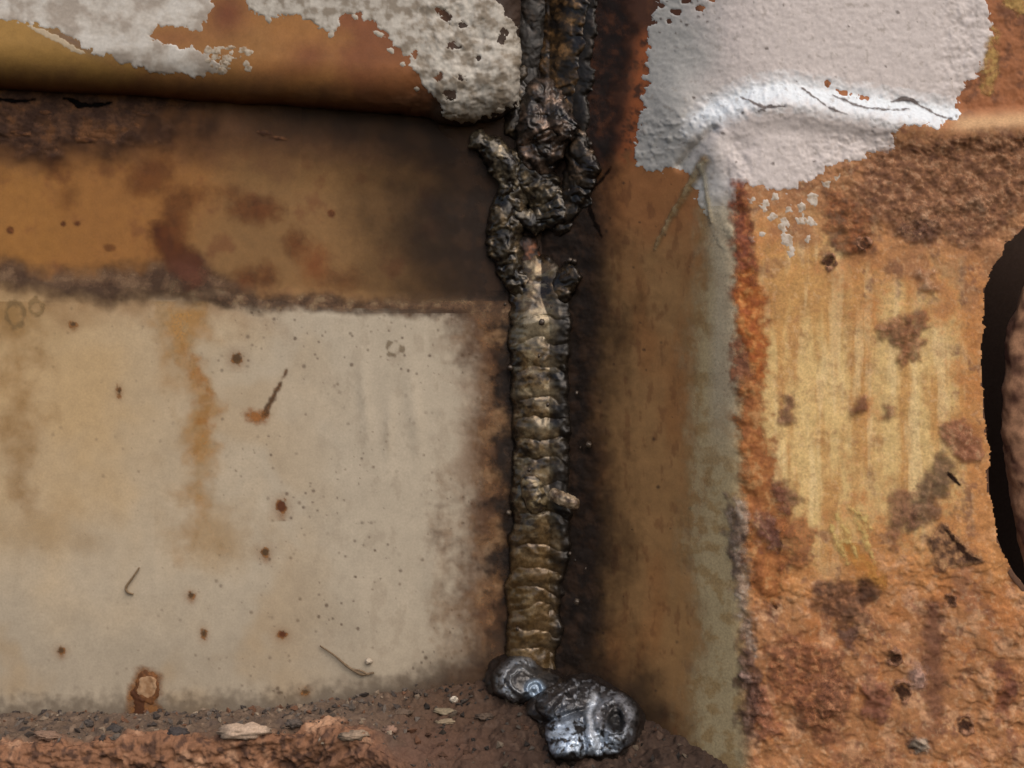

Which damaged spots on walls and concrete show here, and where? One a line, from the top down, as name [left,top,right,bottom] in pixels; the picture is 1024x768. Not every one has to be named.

peeling [0,0,254,79]
peeling [246,0,522,124]
corrosion [0,89,213,167]
peeling [633,0,999,258]
crack [742,87,953,120]
corrosion [729,181,790,606]
corrosion [779,396,793,423]
corrosion [854,397,867,413]
corrosion [127,668,161,714]
corrosion [733,635,763,738]
corrosion [909,605,945,718]
corrosion [995,662,1016,711]